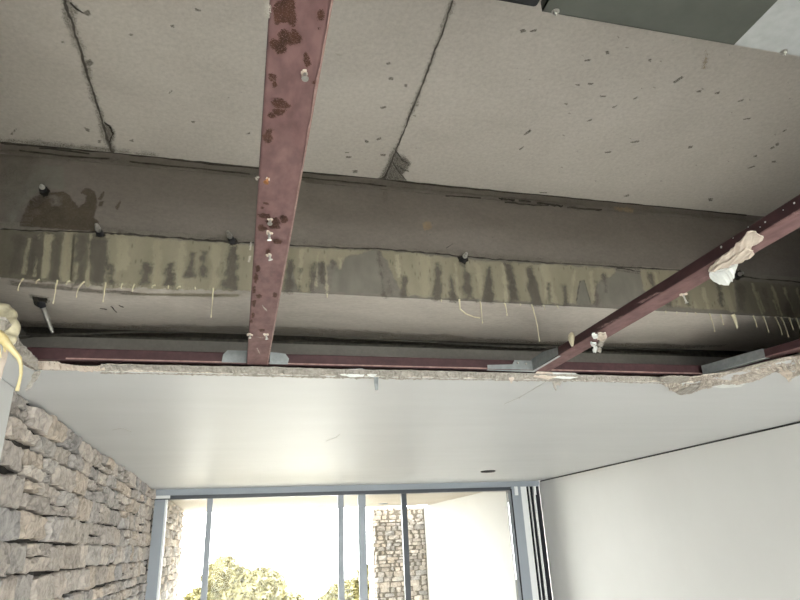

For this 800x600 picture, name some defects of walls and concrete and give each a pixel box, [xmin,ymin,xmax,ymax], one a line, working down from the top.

rust [269,0,303,55]
crack [0,0,259,179]
rust [267,98,291,118]
crack [301,0,747,221]
rust [257,202,288,231]
water stain [0,188,254,340]
rust [249,265,265,332]
water stain [273,247,616,350]
water stain [640,268,678,292]
water stain [664,279,800,338]
flaking render [14,336,800,395]
water stain [588,342,727,353]